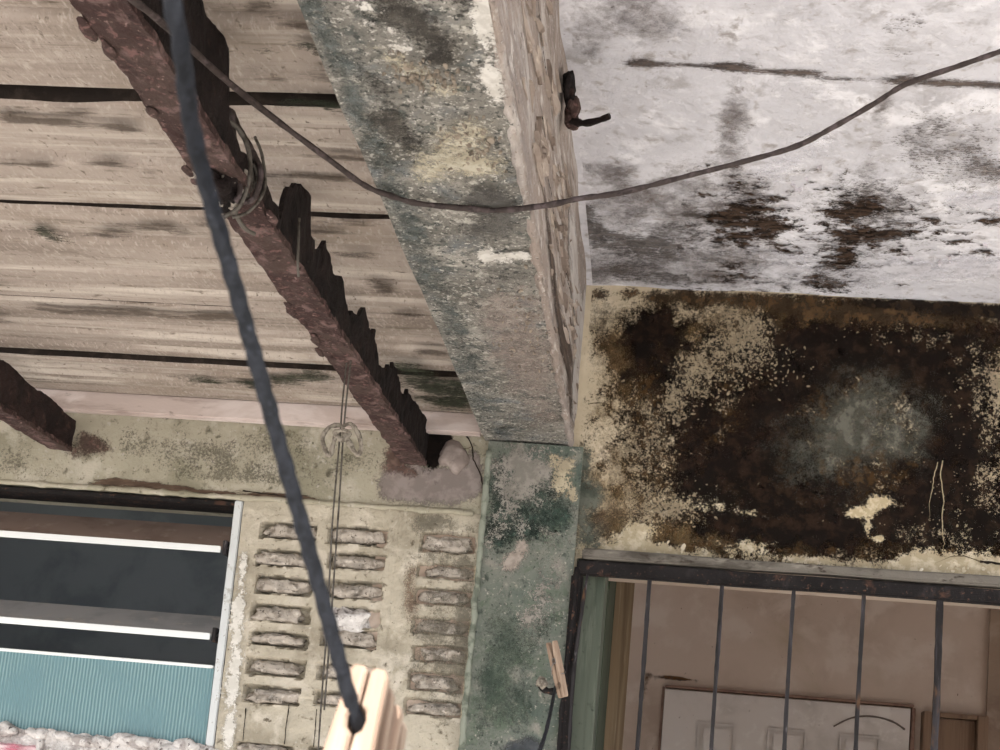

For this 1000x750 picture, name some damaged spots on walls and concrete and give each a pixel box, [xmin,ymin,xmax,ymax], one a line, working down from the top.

rust [76,16,118,62]
water stain [626,59,1000,89]
rust [145,107,158,119]
rust [181,161,196,185]
rust [211,169,239,214]
rust [284,302,333,359]
water stain [563,104,1000,569]
rust [67,432,112,460]
rust [381,447,418,478]
water stain [483,443,568,560]
crack [929,460,1000,565]
water stain [504,737,540,750]